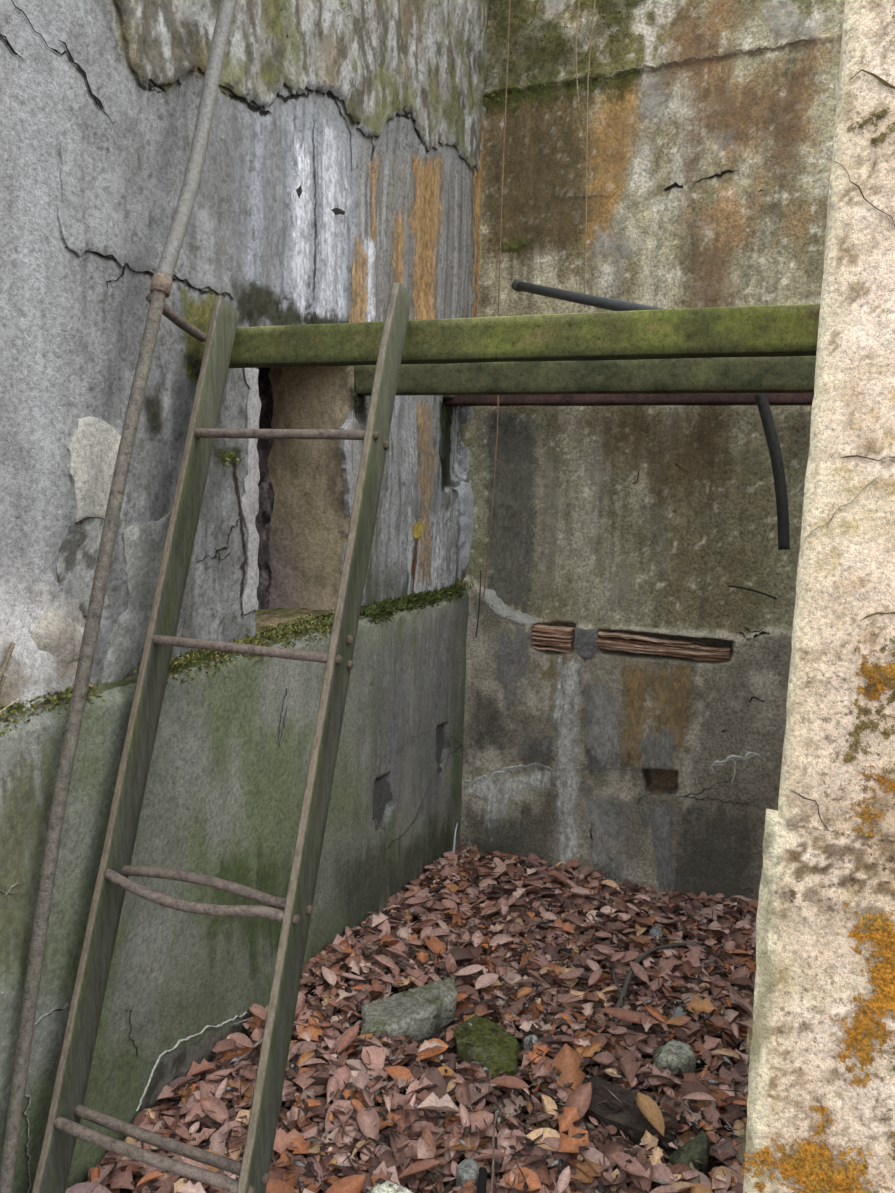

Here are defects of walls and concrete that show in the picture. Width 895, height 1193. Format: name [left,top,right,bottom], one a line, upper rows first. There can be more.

crack [0,0,116,123]
crack [850,69,895,89]
peeling [57,0,221,274]
peeling [173,0,489,300]
crack [664,170,739,191]
crack [834,161,895,227]
corrosion [349,156,378,323]
corrosion [393,156,443,320]
crack [806,455,895,538]
crack [860,612,895,621]
spalling [372,777,393,830]